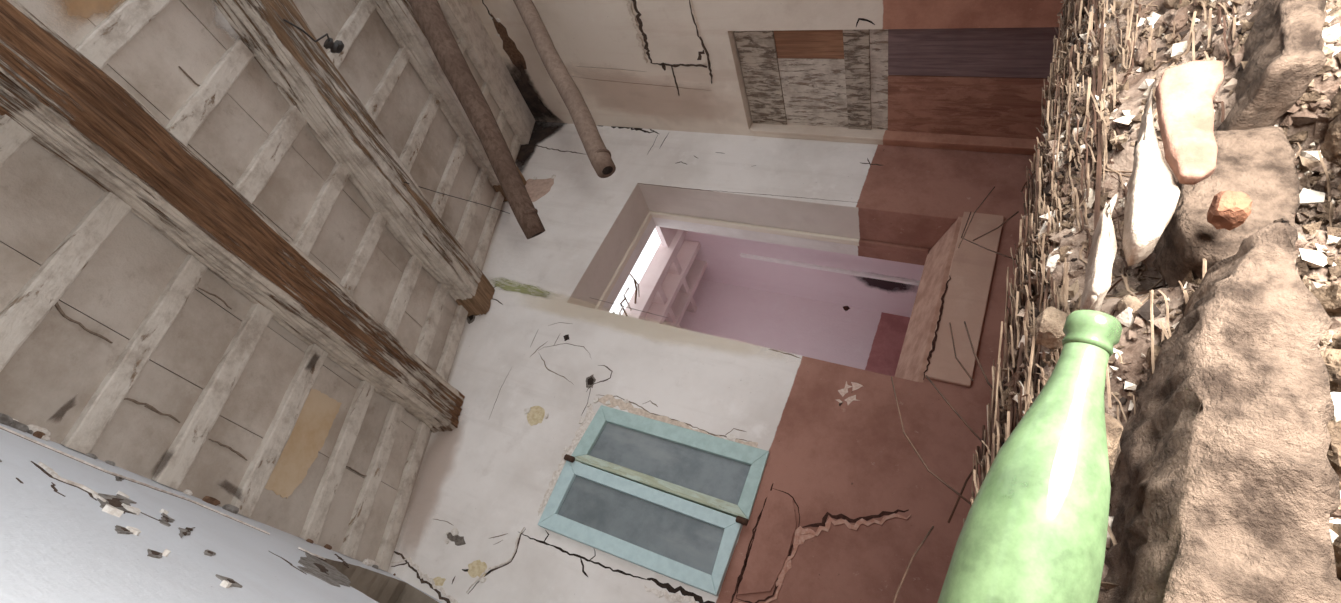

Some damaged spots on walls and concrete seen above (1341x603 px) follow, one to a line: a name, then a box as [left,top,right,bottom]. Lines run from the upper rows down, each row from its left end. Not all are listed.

water stain [60,0,122,18]
crack [572,0,713,95]
crack [489,297,746,441]
flaking render [97,476,141,536]
flaking render [147,549,171,559]
flaking render [159,508,195,538]
flaking render [215,574,243,588]
crack [647,488,911,603]